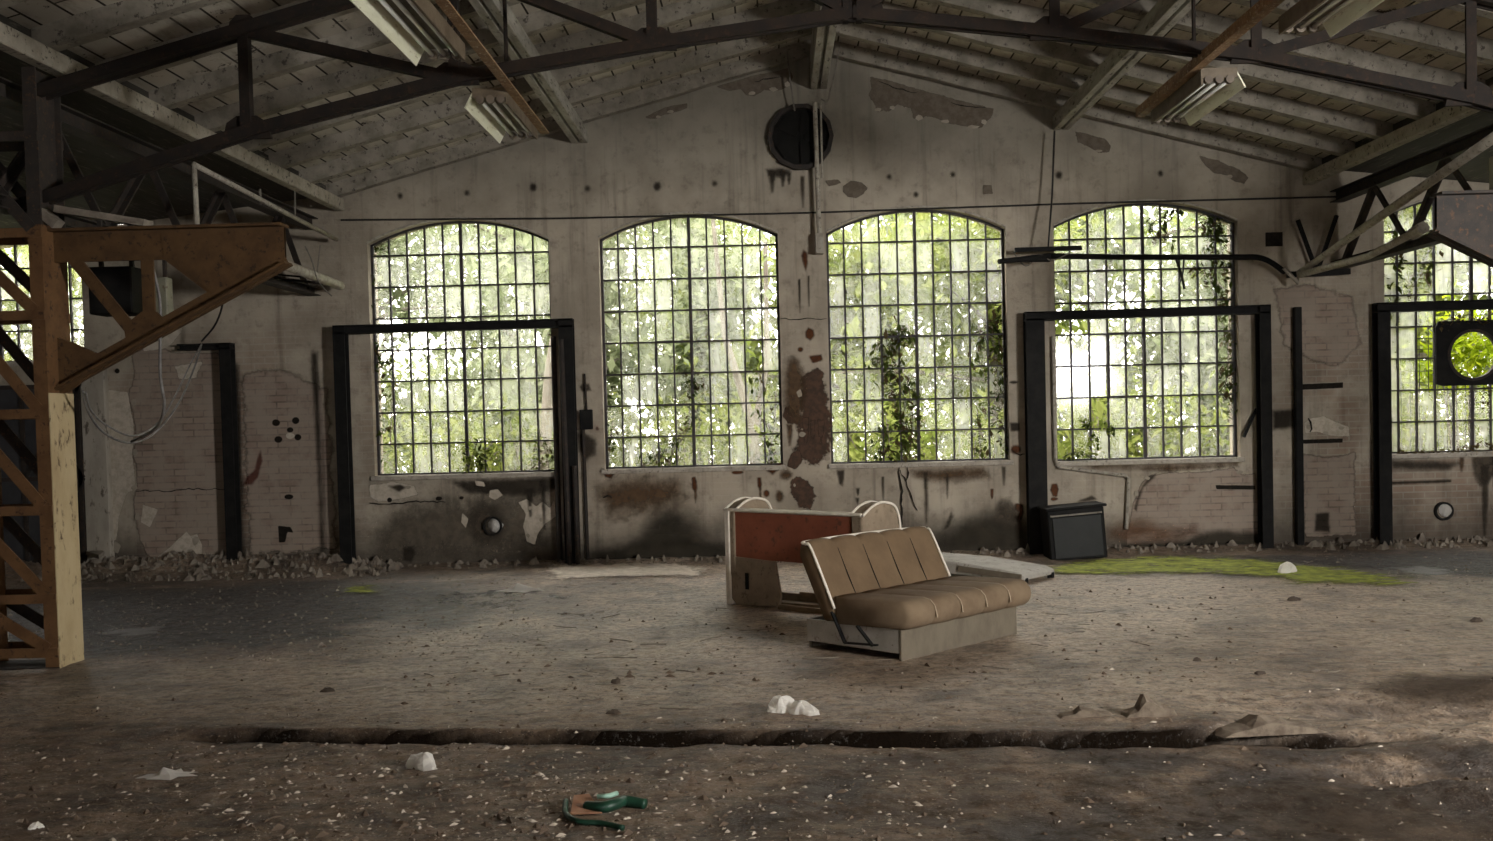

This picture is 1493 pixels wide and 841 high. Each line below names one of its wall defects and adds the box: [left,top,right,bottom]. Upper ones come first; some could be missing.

leakage [768,169,804,199]
peeling [369,481,418,502]
spalling [460,480,502,541]
peeling [519,499,556,544]